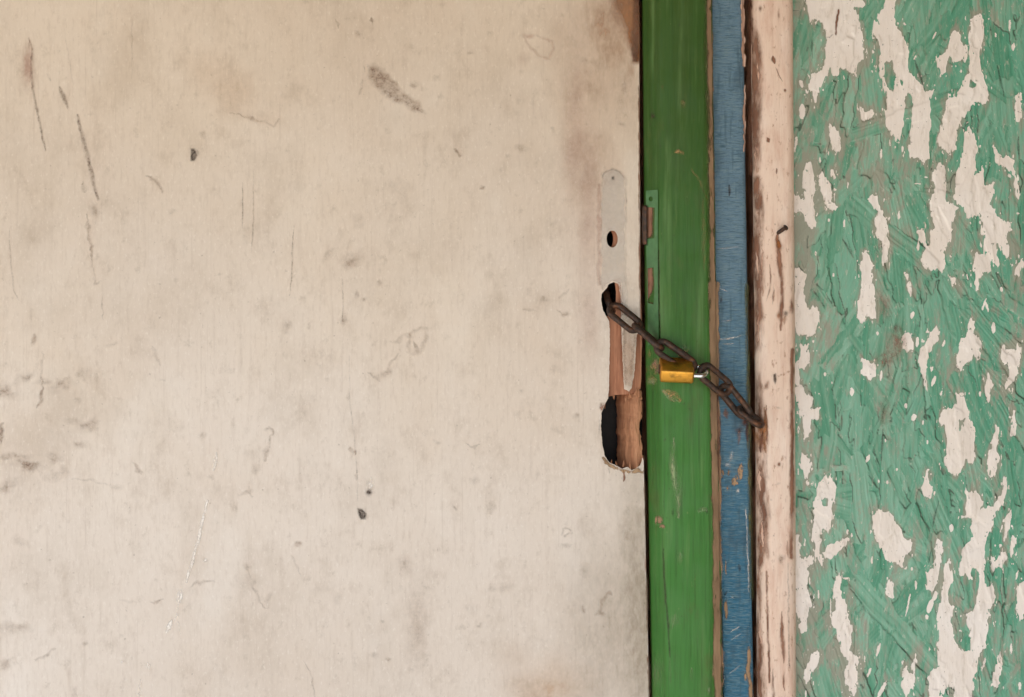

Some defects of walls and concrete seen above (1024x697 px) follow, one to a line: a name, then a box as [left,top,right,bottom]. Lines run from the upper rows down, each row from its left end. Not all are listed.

peeling [740,0,883,697]
peeling [799,0,1024,371]
peeling [870,326,1024,697]